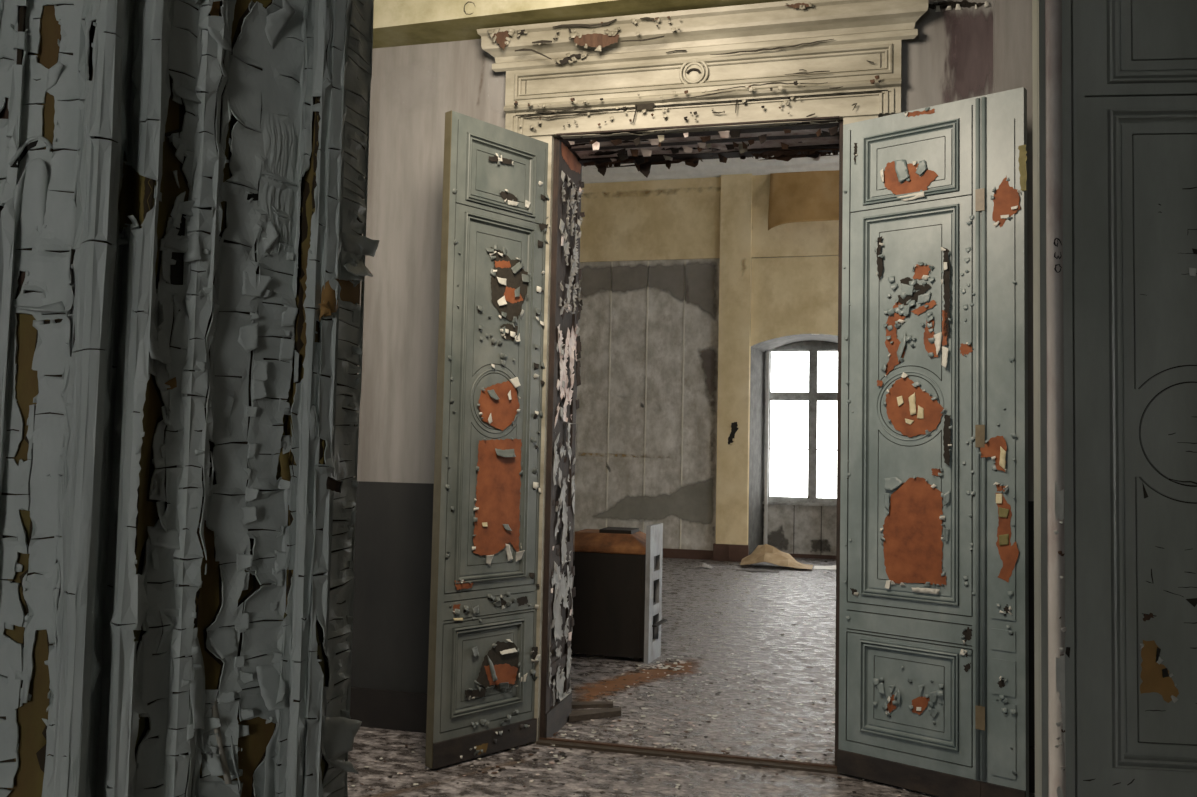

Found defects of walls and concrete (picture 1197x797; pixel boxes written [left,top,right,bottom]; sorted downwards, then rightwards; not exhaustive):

peeling [10,3,64,151]
peeling [118,83,227,296]
peeling [538,18,640,65]
peeling [880,159,938,201]
peeling [991,145,1027,227]
peeling [12,271,68,465]
peeling [132,325,177,574]
peeling [238,100,380,621]
peeling [449,80,839,707]
peeling [875,236,1019,636]
peeling [3,508,51,797]
peeling [179,440,290,797]